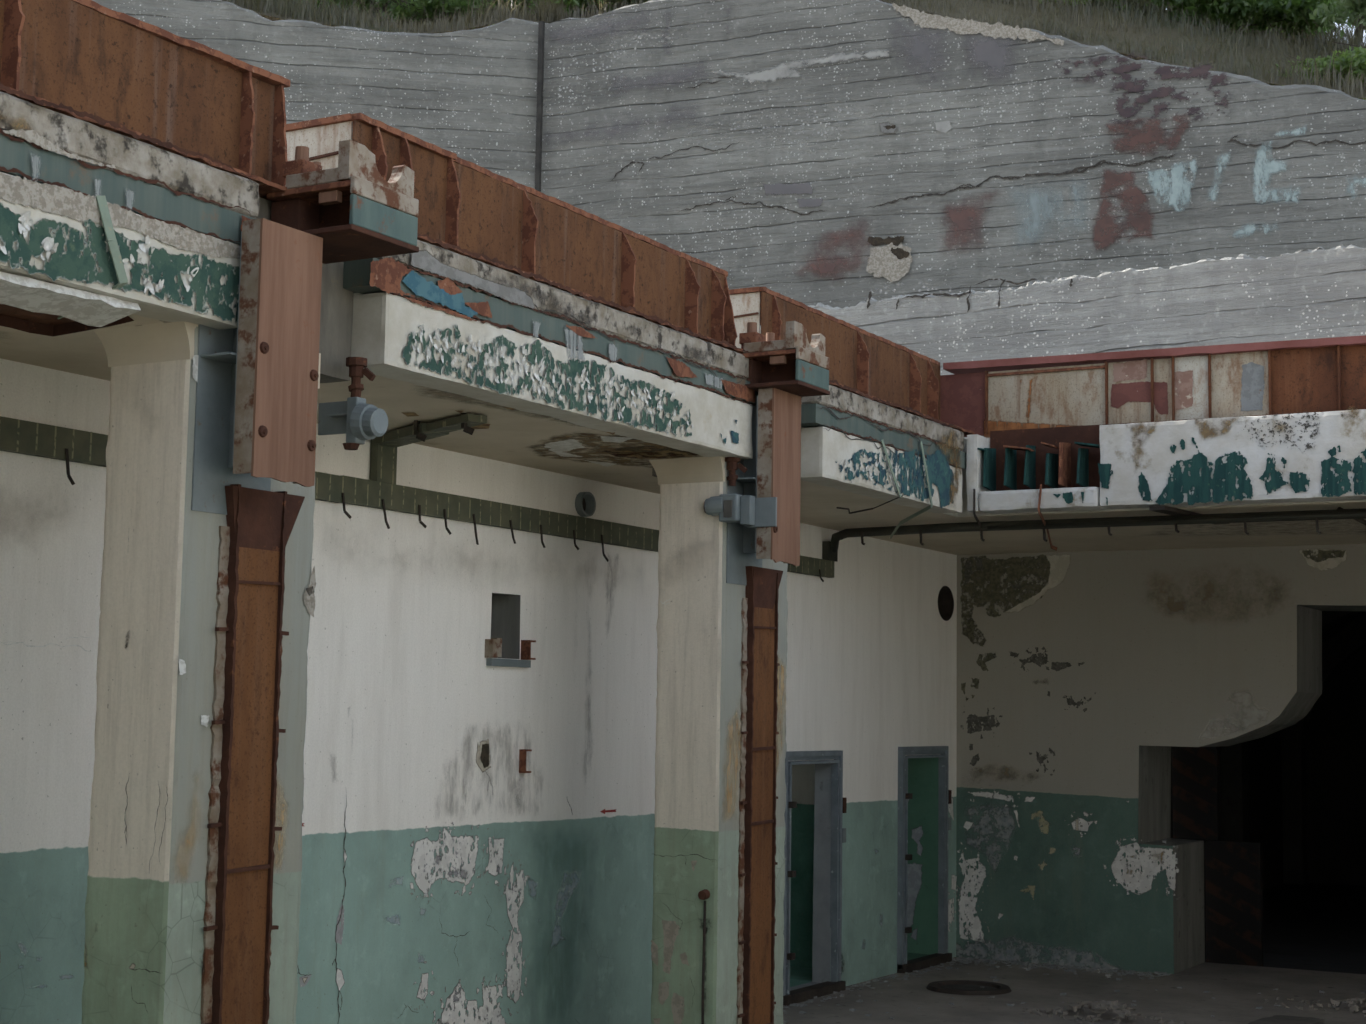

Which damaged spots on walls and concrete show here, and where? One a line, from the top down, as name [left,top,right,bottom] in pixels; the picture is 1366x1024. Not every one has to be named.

crack [1228,135,1366,149]
crack [870,154,1176,207]
peeling [0,172,241,325]
corrosion [369,257,492,323]
crack [867,278,1037,312]
peeling [402,270,698,467]
corrosion [666,357,698,378]
corrosion [721,379,755,402]
peeling [1138,437,1366,505]
corrosion [776,662,784,767]
crack [297,795,347,1022]
peeling [404,822,530,1024]